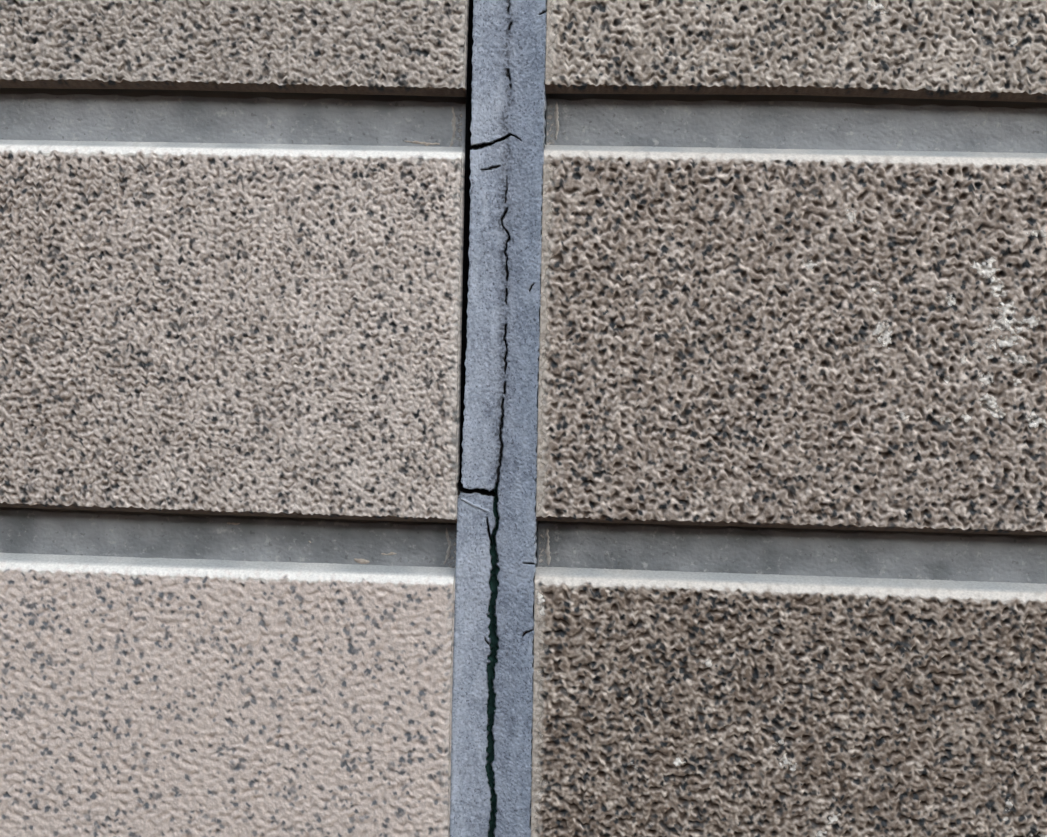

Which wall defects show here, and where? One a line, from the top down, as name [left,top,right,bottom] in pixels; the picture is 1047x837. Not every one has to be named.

crack [457,134,535,837]